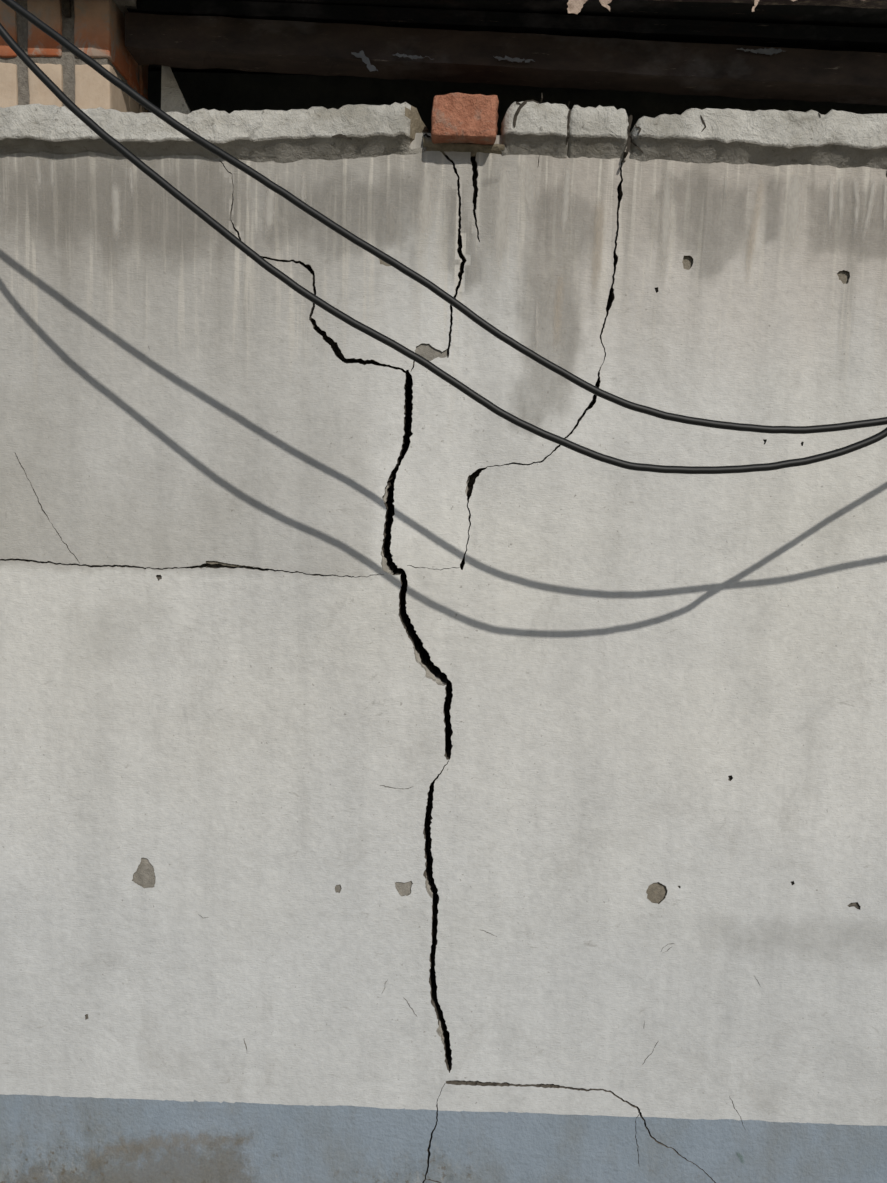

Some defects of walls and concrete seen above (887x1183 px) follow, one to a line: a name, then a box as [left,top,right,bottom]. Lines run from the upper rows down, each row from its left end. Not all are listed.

peeling [567,0,612,15]
crack [513,95,571,145]
water stain [113,171,132,229]
crack [0,115,716,1183]
flaking render [132,858,156,888]
flaking render [395,881,413,896]
flaking render [646,882,681,904]